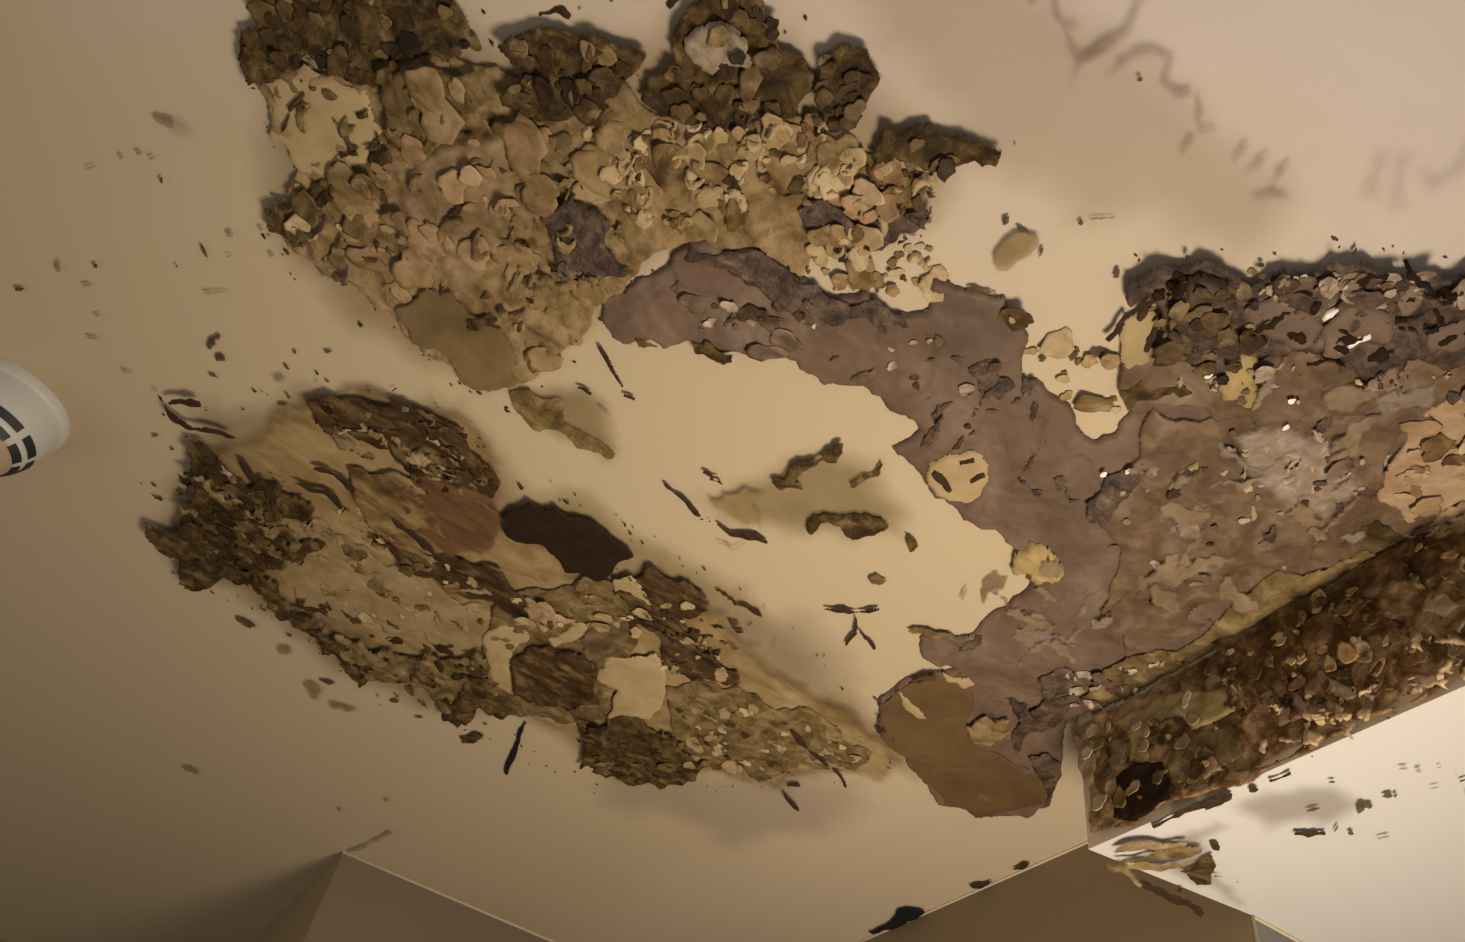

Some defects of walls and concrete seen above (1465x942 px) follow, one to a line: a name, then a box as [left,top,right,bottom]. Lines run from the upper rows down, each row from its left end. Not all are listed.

flaking render [144,0,1465,833]
peeling [1293,825,1354,838]
peeling [1106,840,1222,917]